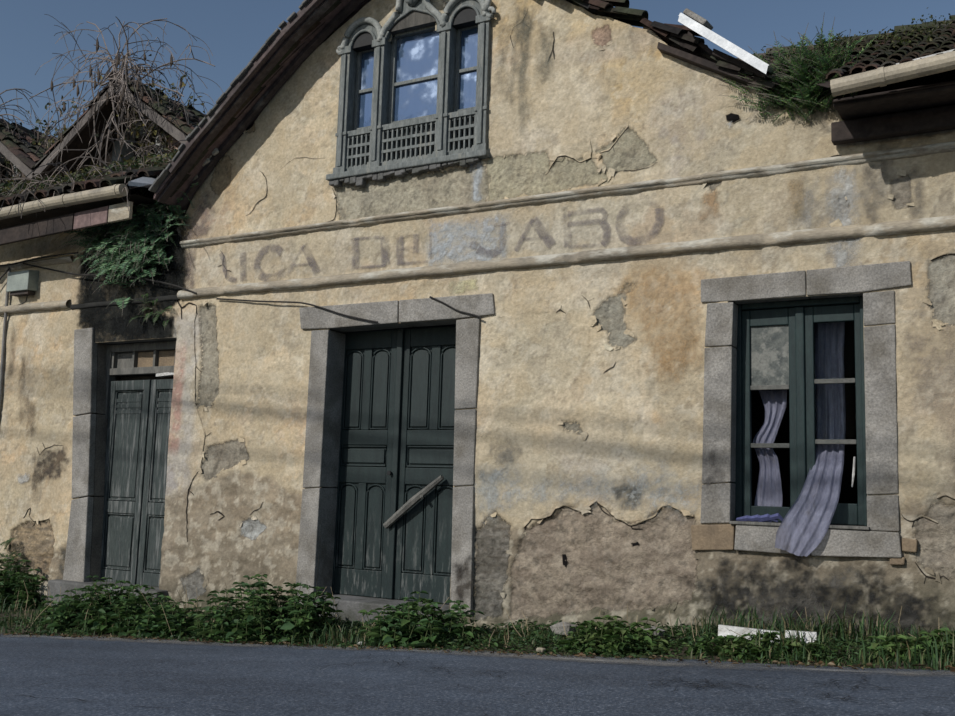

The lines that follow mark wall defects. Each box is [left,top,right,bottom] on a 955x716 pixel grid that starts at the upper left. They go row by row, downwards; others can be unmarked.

spalling [332,128,657,221]
spalling [197,301,221,412]
spalling [589,282,637,351]
spalling [922,254,955,330]
spalling [197,437,249,480]
spalling [6,516,55,575]
spalling [473,503,701,620]
spalling [914,501,955,583]